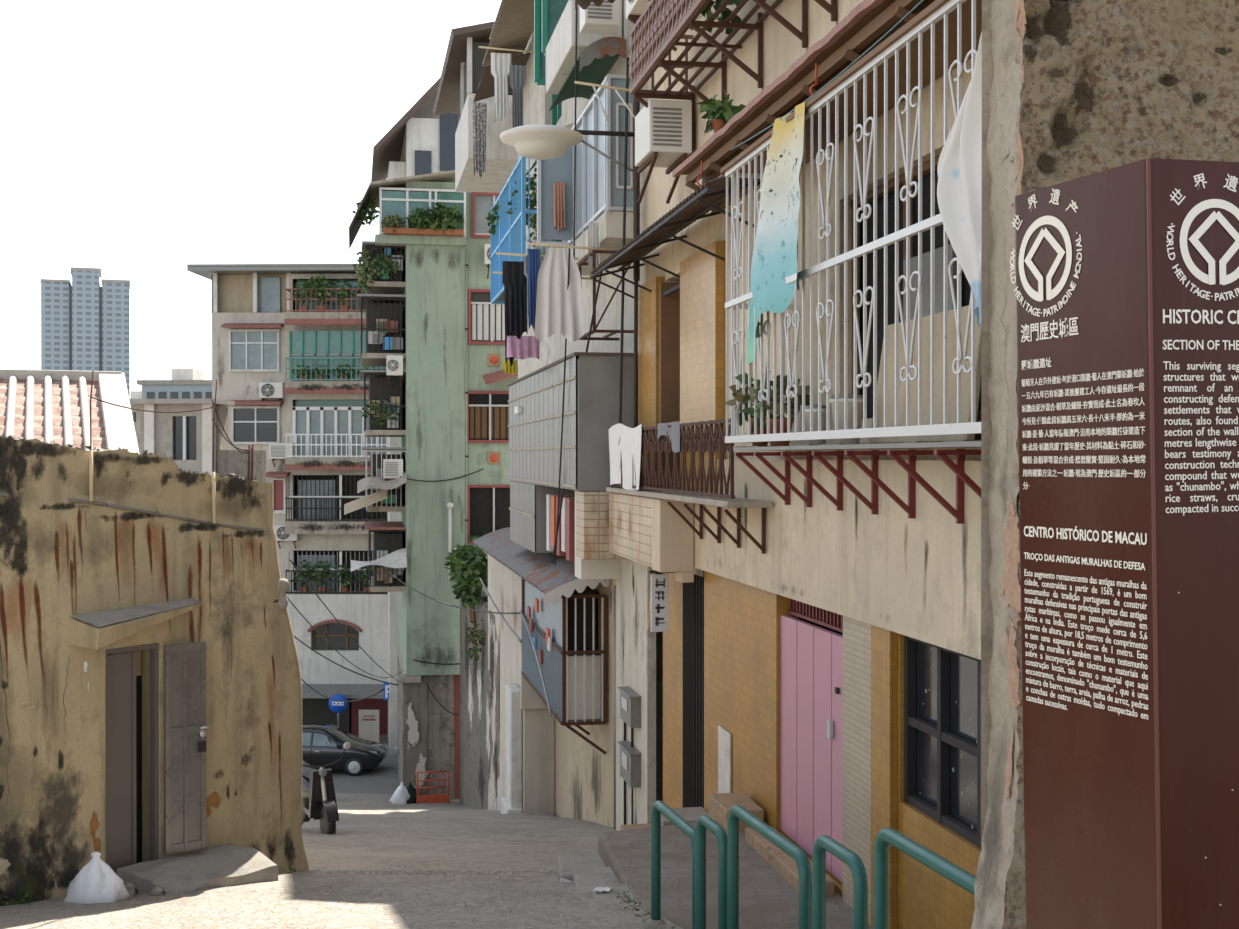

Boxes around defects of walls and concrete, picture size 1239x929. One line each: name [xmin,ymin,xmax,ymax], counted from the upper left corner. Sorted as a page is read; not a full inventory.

water stain [0,436,75,576]
rust [0,586,8,666]
rust [19,580,44,678]
rust [55,510,82,607]
rust [133,525,168,602]
rust [188,534,233,642]
peeling [405,702,428,794]
water stain [0,818,78,906]